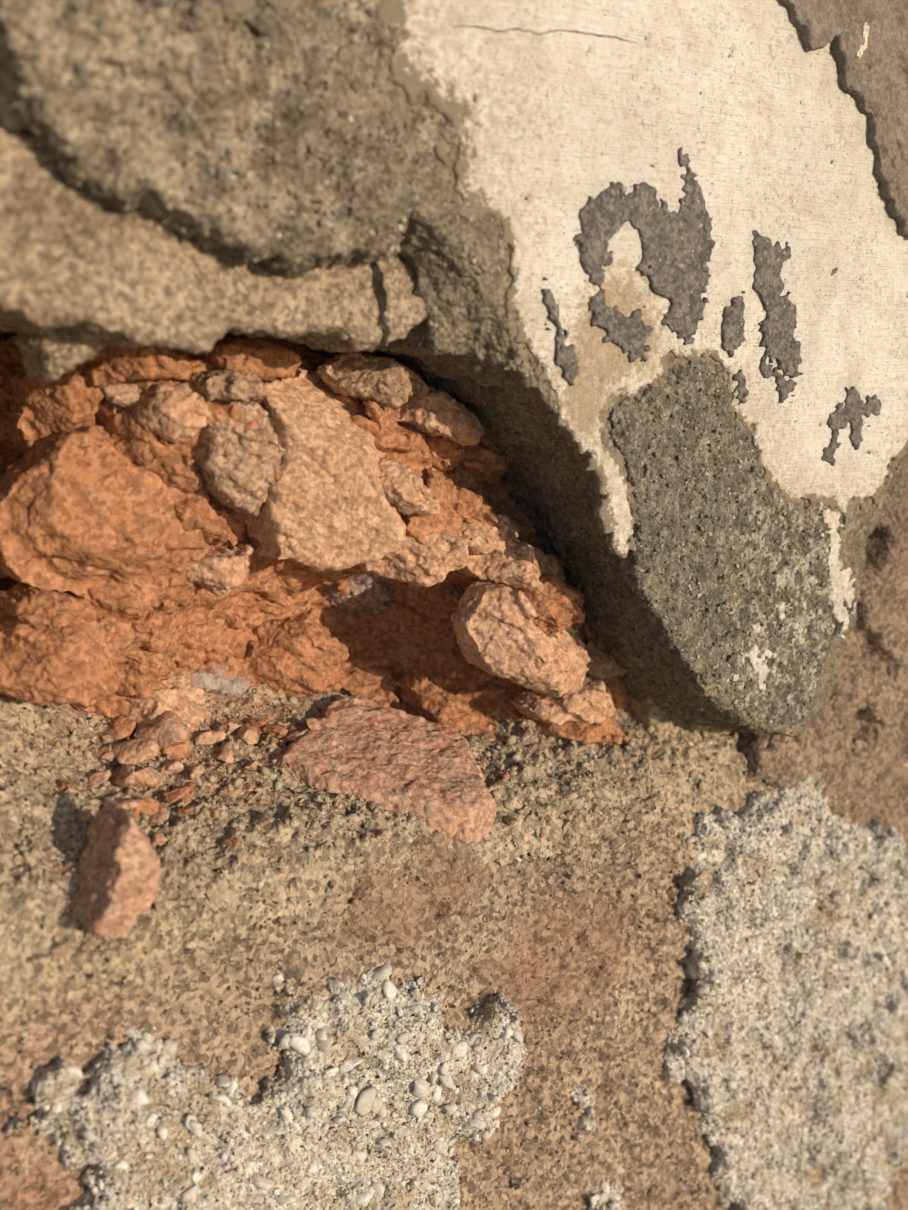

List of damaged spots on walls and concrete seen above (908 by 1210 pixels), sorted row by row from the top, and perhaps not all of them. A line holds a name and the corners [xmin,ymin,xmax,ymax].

spalling [0,331,630,745]